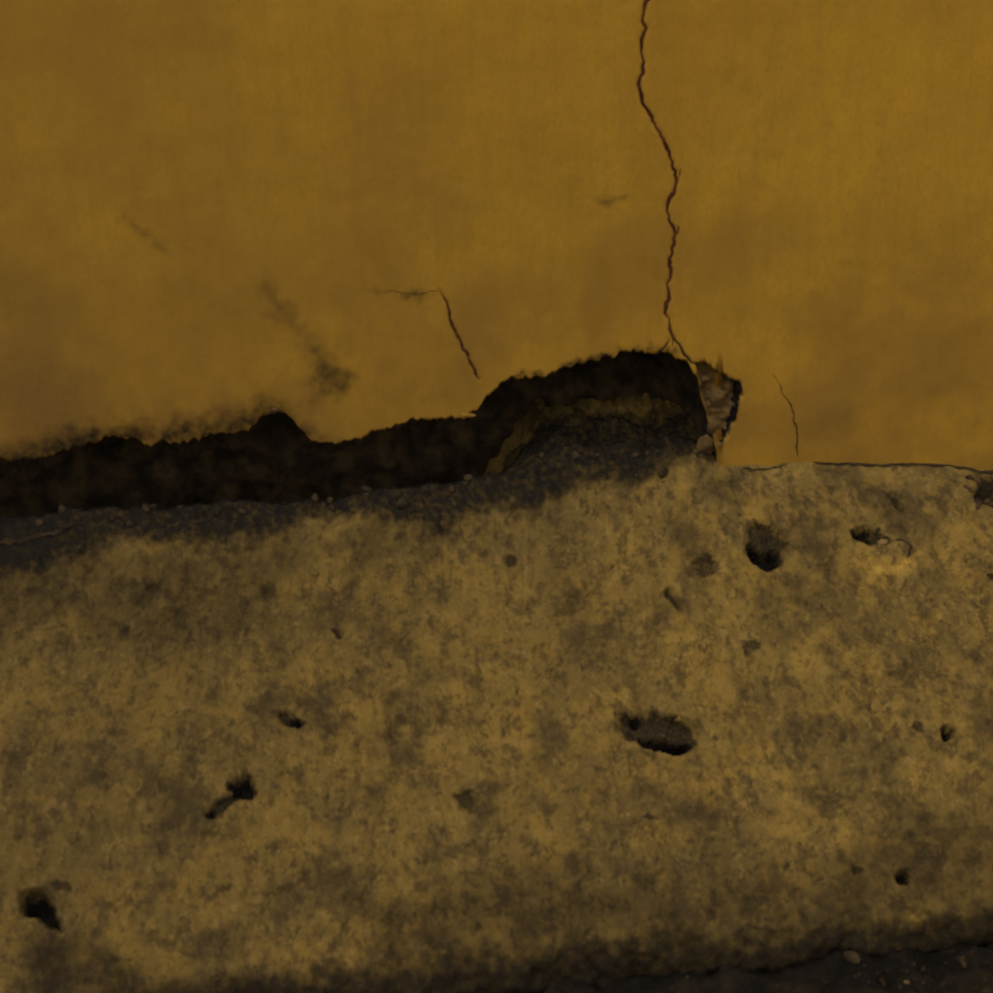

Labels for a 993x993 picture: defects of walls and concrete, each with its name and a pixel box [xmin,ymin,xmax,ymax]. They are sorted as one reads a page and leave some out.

crack [637,0,698,366]
crack [380,290,479,379]
spalling [0,349,743,529]
spalling [963,475,993,509]
spalling [746,522,788,573]
spalling [851,528,891,546]
spalling [614,710,697,756]
spalling [206,774,258,819]
spalling [26,880,72,930]